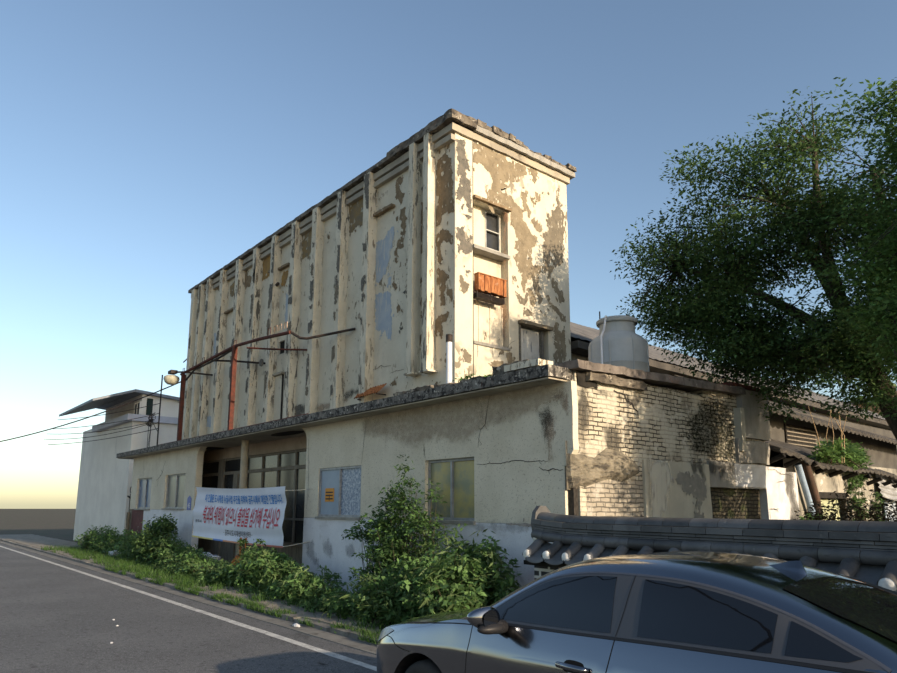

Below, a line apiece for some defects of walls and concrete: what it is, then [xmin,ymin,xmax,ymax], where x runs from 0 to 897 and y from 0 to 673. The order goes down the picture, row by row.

peeling [188,236,292,368]
peeling [291,224,315,309]
peeling [327,174,407,341]
peeling [435,139,571,367]
peeling [295,354,309,416]
crack [477,396,563,471]
peeling [672,459,707,518]